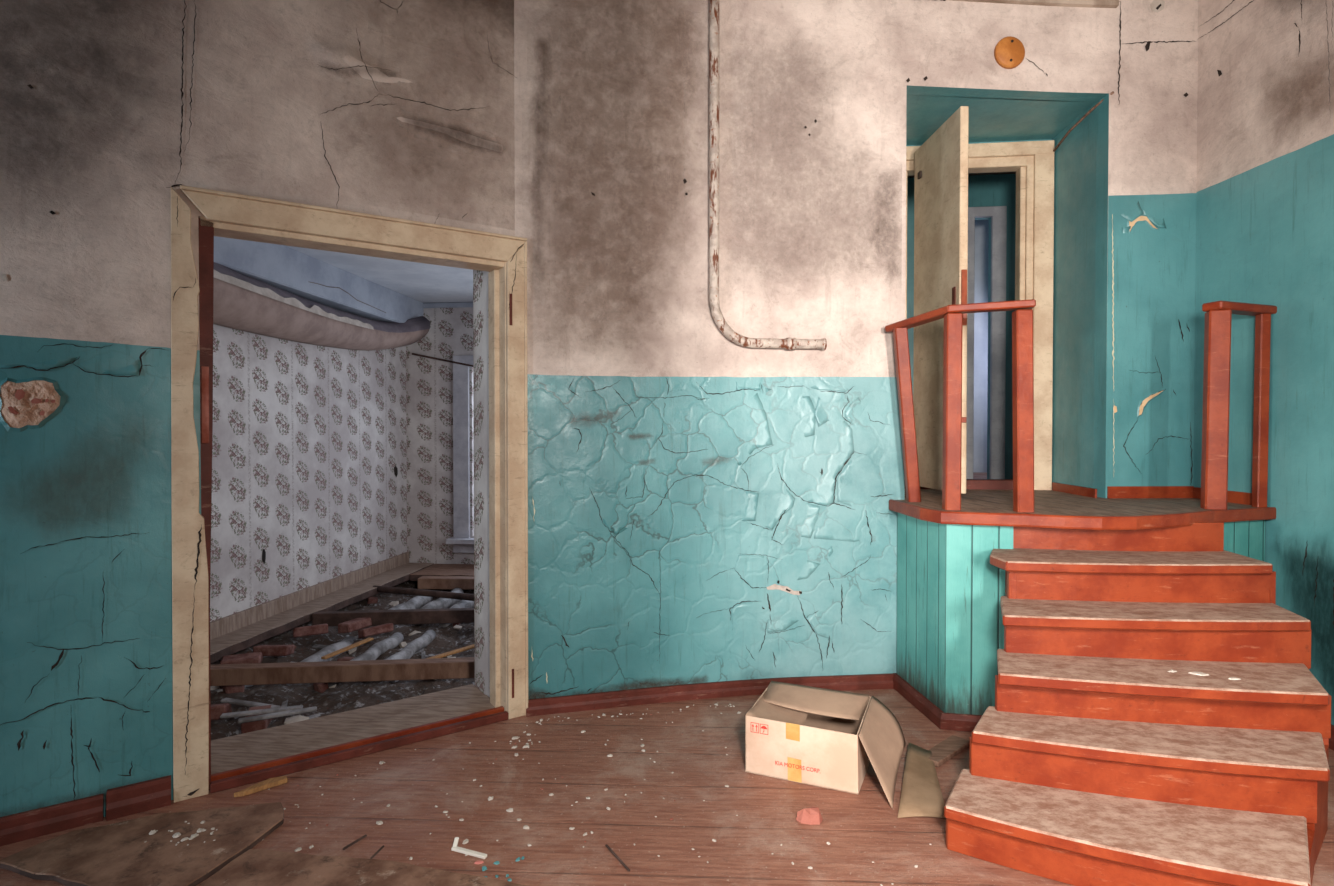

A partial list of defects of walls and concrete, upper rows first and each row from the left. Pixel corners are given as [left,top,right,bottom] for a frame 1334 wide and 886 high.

crack [1118,0,1254,104]
crack [1294,0,1334,110]
crack [166,0,196,226]
crack [317,25,489,205]
peeling [1121,201,1166,234]
spalling [0,377,66,432]
crack [0,343,165,377]
crack [560,378,894,668]
peeling [767,580,802,595]
crack [1,524,202,800]